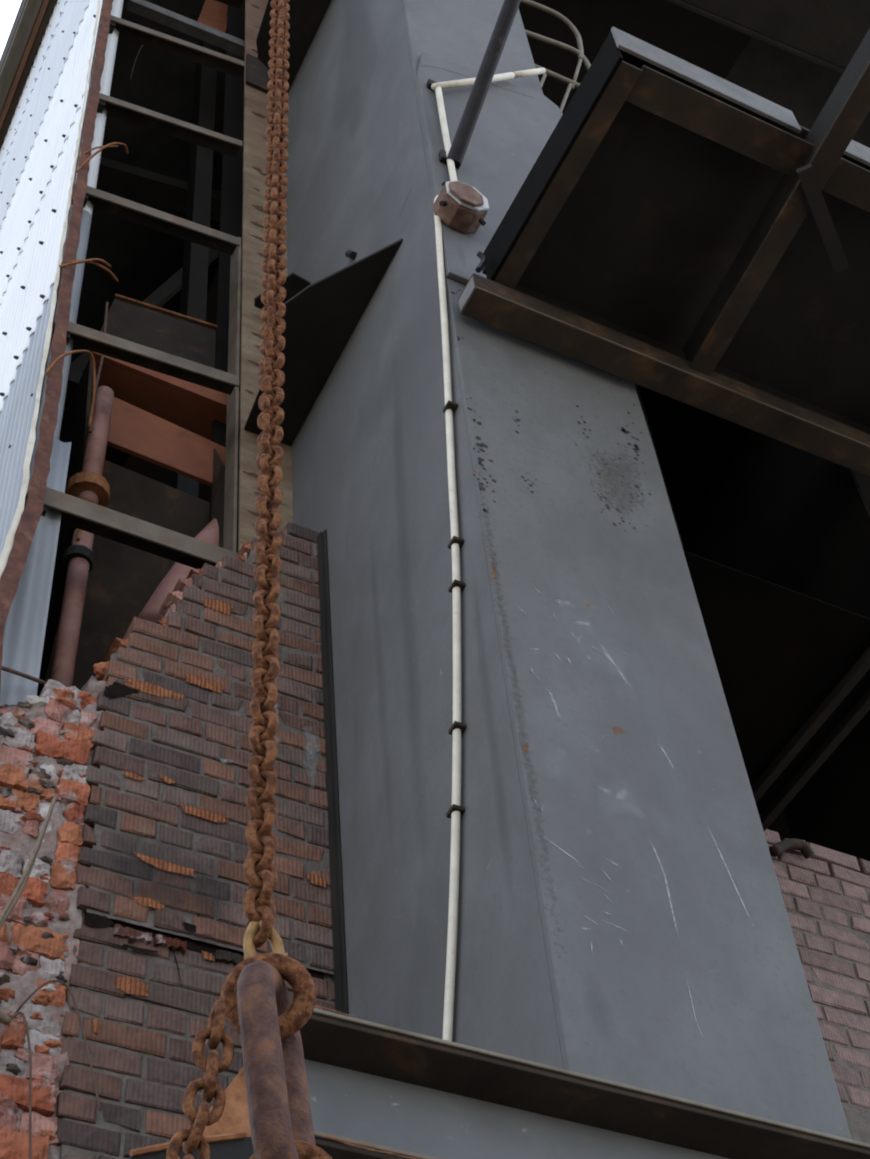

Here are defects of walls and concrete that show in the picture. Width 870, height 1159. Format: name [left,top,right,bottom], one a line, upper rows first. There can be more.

rust [466,397,497,512]
rust [590,404,652,531]
spalling [157,561,222,627]
spalling [124,674,223,700]
spalling [177,803,227,823]
spalling [134,852,196,877]
spalling [0,637,129,1159]
spalling [131,897,165,909]
crack [84,912,244,987]
spalling [114,976,149,996]
crack [305,967,324,980]